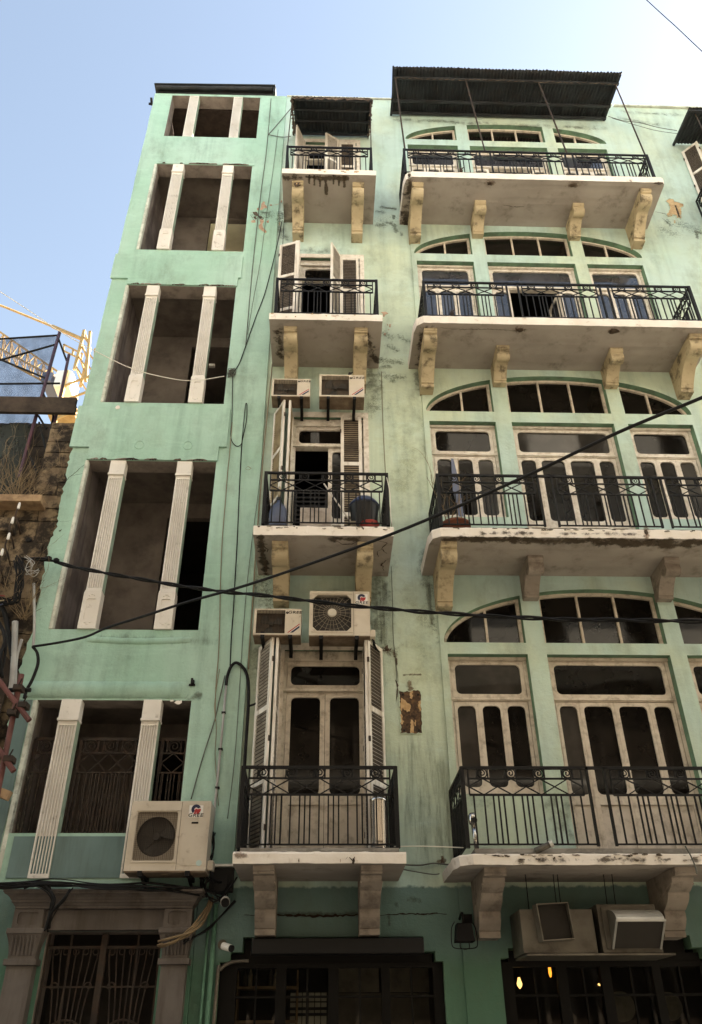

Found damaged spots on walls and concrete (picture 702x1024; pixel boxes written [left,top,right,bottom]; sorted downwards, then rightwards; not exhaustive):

damp [282,173,349,195]
peeling [251,200,282,233]
peeling [659,198,684,224]
peeling [398,681,423,735]